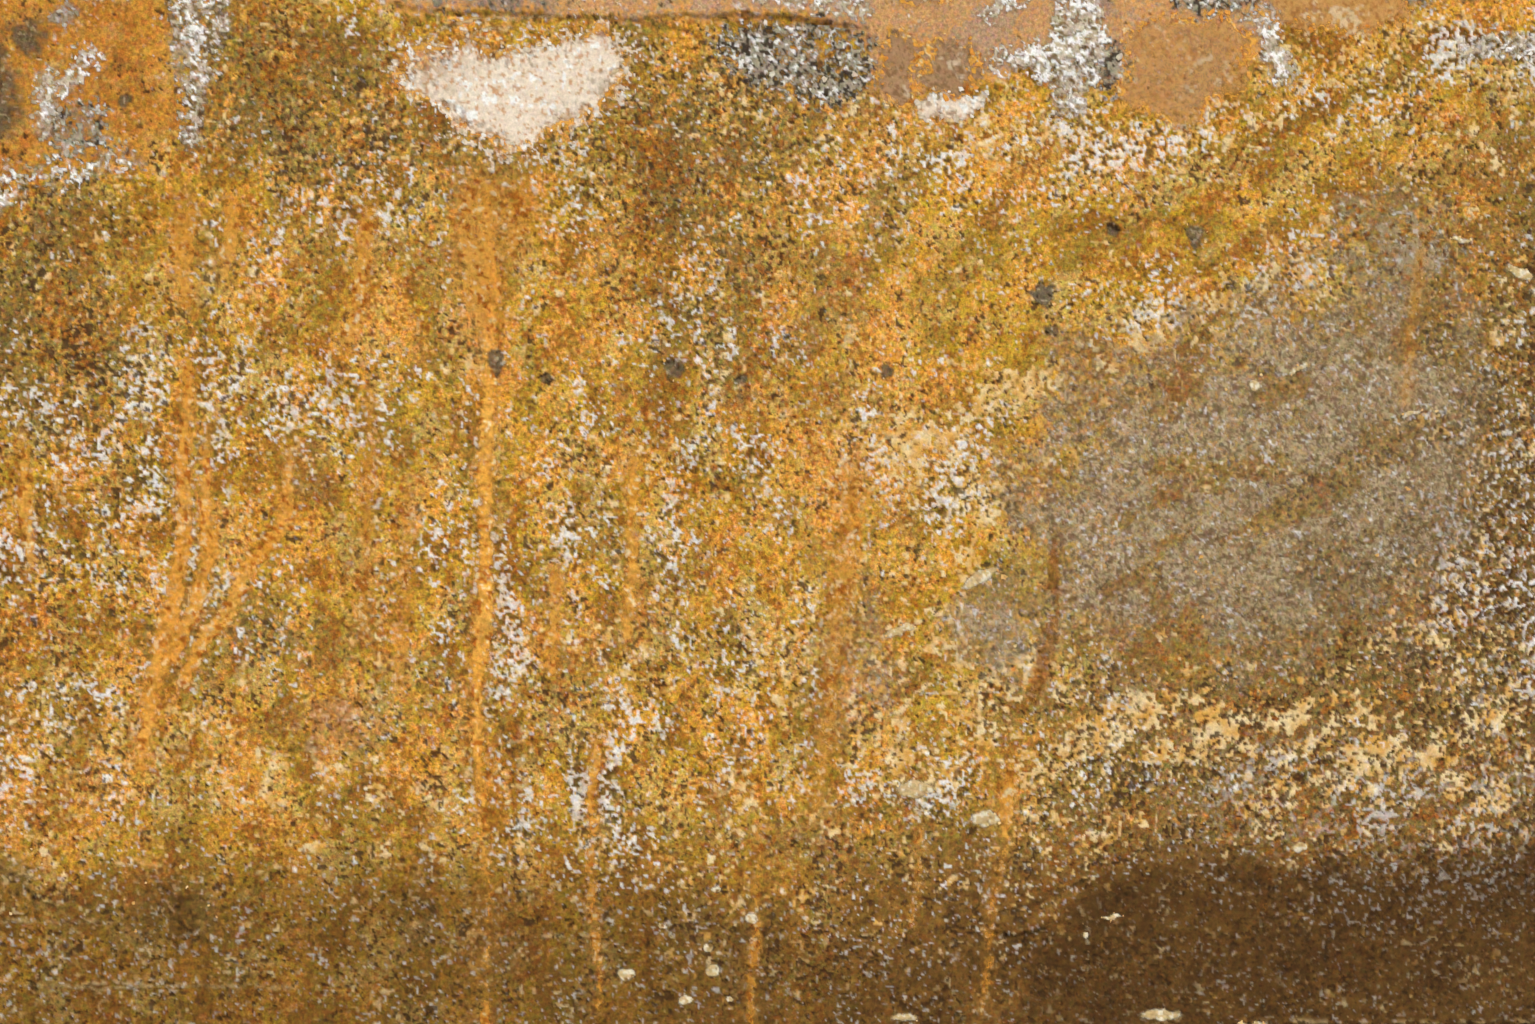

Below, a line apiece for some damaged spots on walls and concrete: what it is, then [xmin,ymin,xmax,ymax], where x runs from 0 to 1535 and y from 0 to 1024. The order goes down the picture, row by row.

water stain [0,19,147,206]
water stain [165,0,230,157]
peeling [379,0,654,172]
water stain [706,0,879,107]
water stain [977,0,1137,120]
corrosion [14,450,39,571]
corrosion [133,362,295,772]
corrosion [458,189,528,921]
corrosion [622,457,641,643]
corrosion [585,740,605,1009]
corrosion [985,777,1016,943]
water stain [1028,855,1535,1024]